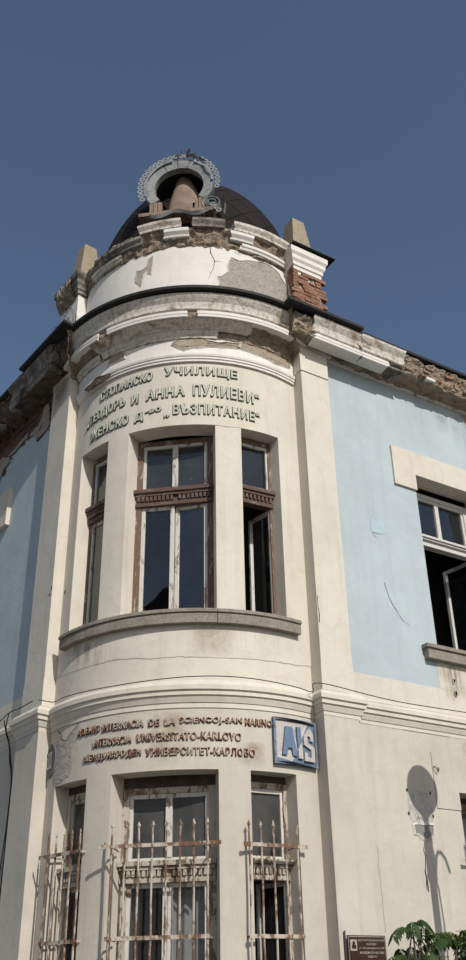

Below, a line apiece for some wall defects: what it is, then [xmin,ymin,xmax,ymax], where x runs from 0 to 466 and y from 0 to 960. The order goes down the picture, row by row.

peeling [134,255,155,288]
spalling [217,257,328,311]
flaking render [0,388,61,484]
spalling [412,821,435,842]